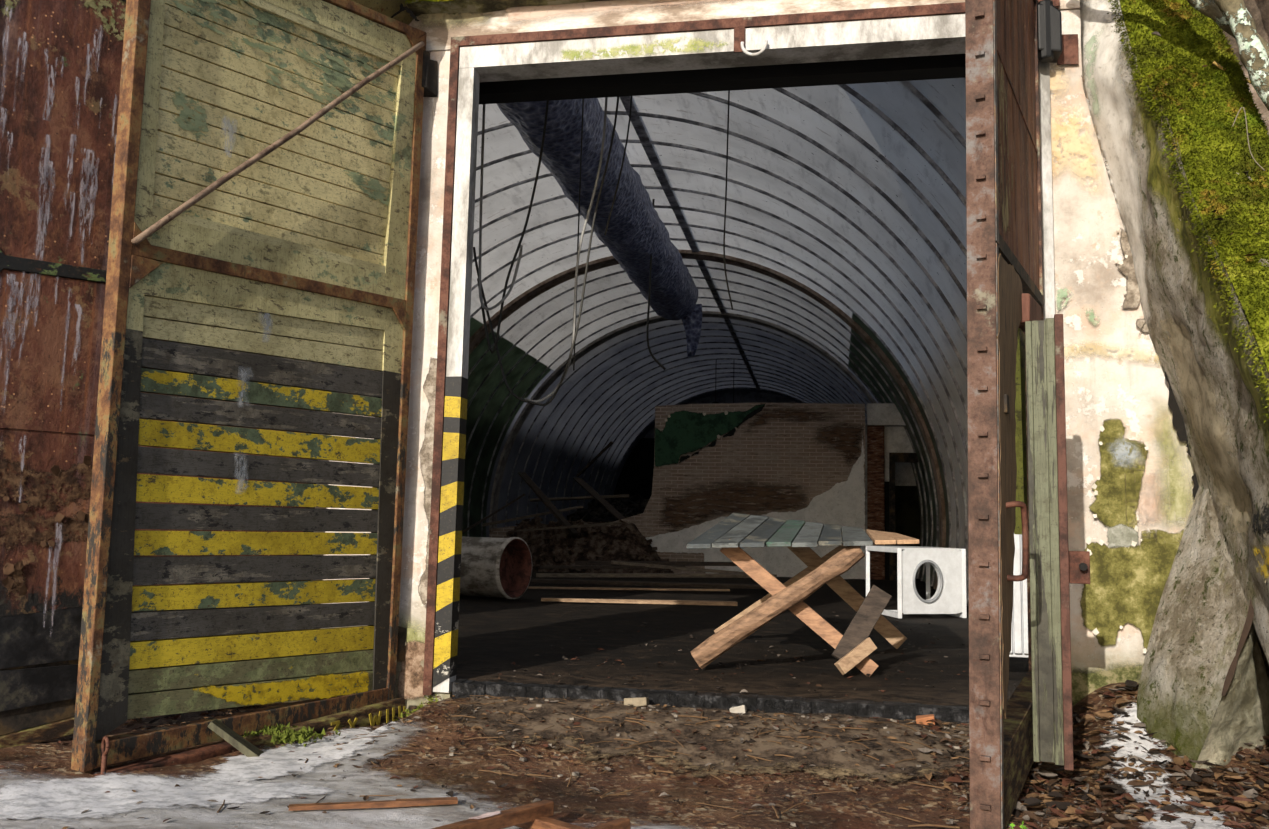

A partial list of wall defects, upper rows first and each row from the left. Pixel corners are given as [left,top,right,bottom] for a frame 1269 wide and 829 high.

water stain [43,54,54,120]
water stain [76,26,102,111]
water stain [3,134,97,351]
water stain [56,276,84,396]
peeling [1080,0,1269,586]
peeling [655,404,765,467]
peeling [645,516,744,573]
peeling [739,546,808,577]
peeling [757,435,865,558]
peeling [840,546,865,579]
peeling [1080,418,1184,654]
spalling [1221,597,1254,696]